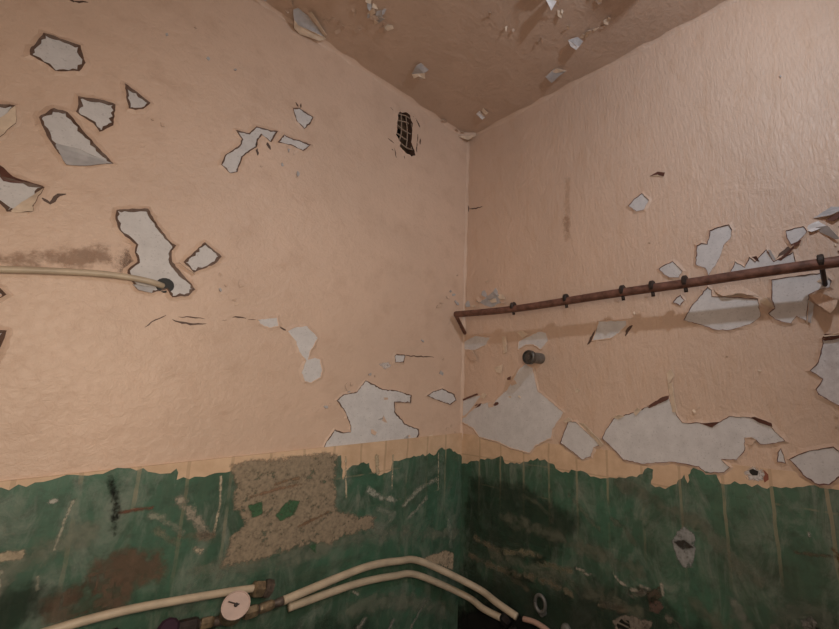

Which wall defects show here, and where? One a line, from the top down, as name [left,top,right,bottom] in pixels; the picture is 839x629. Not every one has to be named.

peeling [23,28,92,78]
peeling [546,0,570,29]
peeling [33,80,165,170]
peeling [0,165,66,217]
peeling [109,205,226,302]
peeling [656,206,839,334]
peeling [0,325,13,363]
peeling [253,314,325,386]
peeling [805,331,839,429]
peeling [222,373,420,567]
peeling [424,363,839,489]
spalling [672,527,696,568]